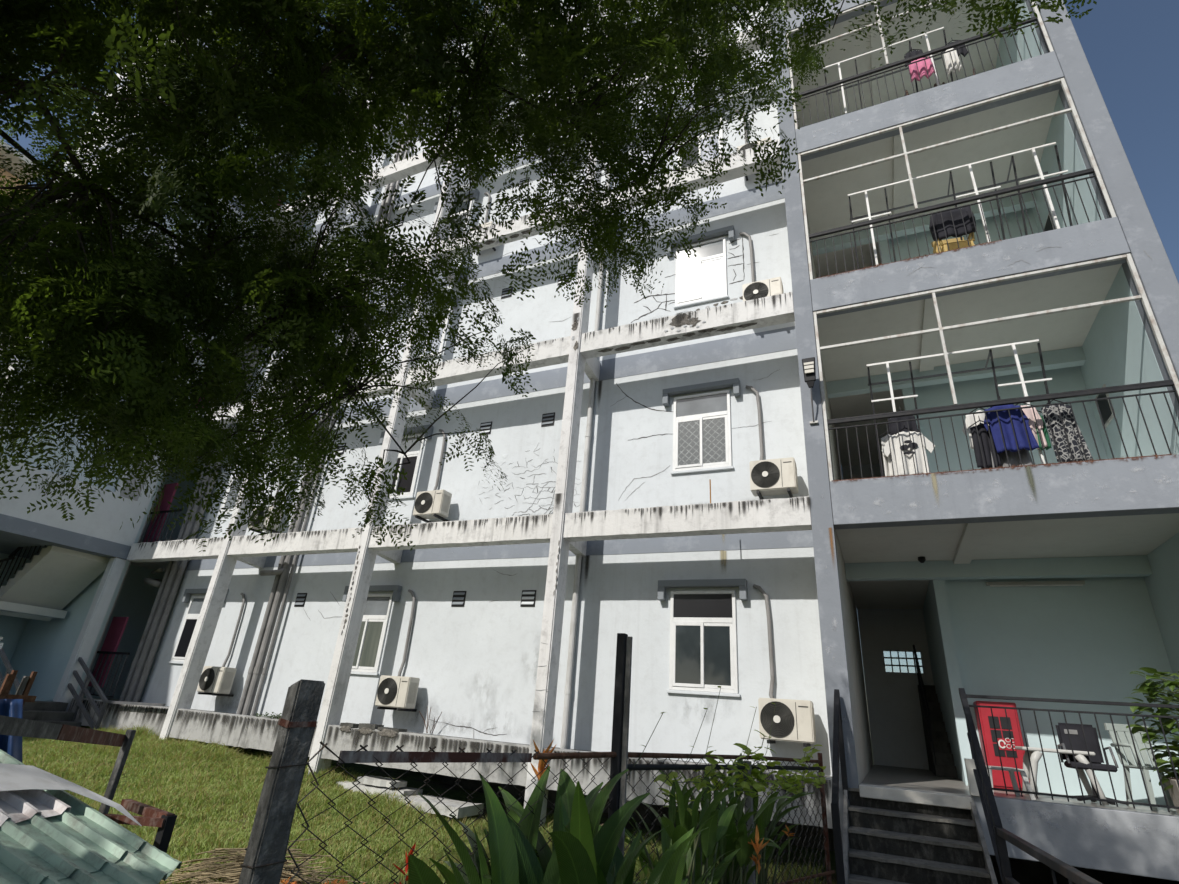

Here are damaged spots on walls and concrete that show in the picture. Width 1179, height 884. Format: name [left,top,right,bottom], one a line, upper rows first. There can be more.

crack [631,274,676,323]
leakage [683,292,790,319]
crack [615,383,672,440]
crack [480,443,580,516]
crack [618,466,669,501]
leakage [625,499,770,517]
leakage [139,512,549,549]
leakage [69,698,278,736]
leakage [315,725,528,765]